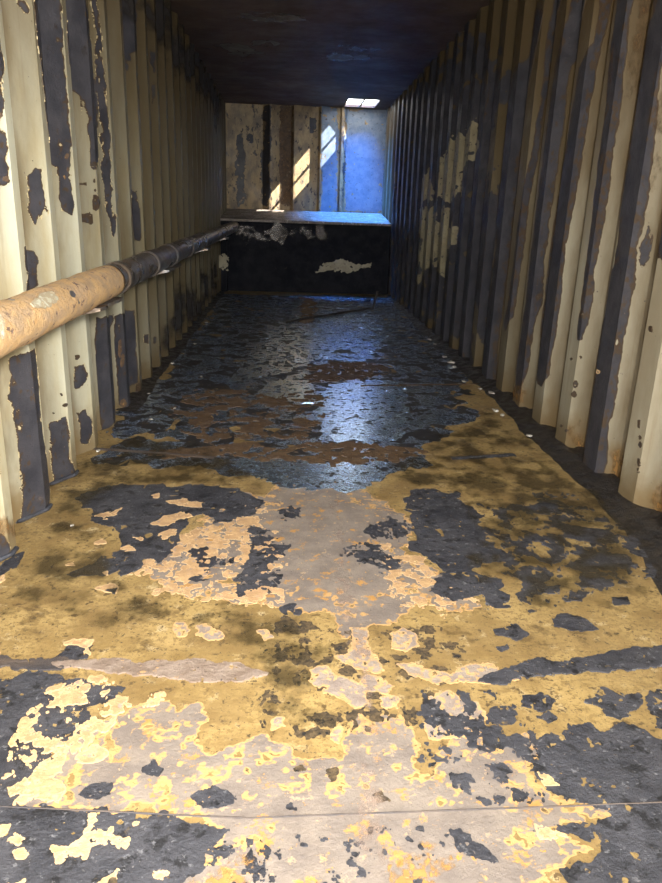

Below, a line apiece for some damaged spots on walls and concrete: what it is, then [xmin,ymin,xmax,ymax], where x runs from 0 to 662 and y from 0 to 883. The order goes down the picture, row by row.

peeling [0,37,10,186]
damp [163,260,217,350]
peeling [7,0,634,577]
peeling [583,0,662,473]
peeling [0,533,25,583]
peeling [403,488,638,610]
peeling [56,638,94,660]
peeling [493,623,530,652]
peeling [552,613,599,632]
peeling [0,670,230,883]
peeling [486,686,662,883]